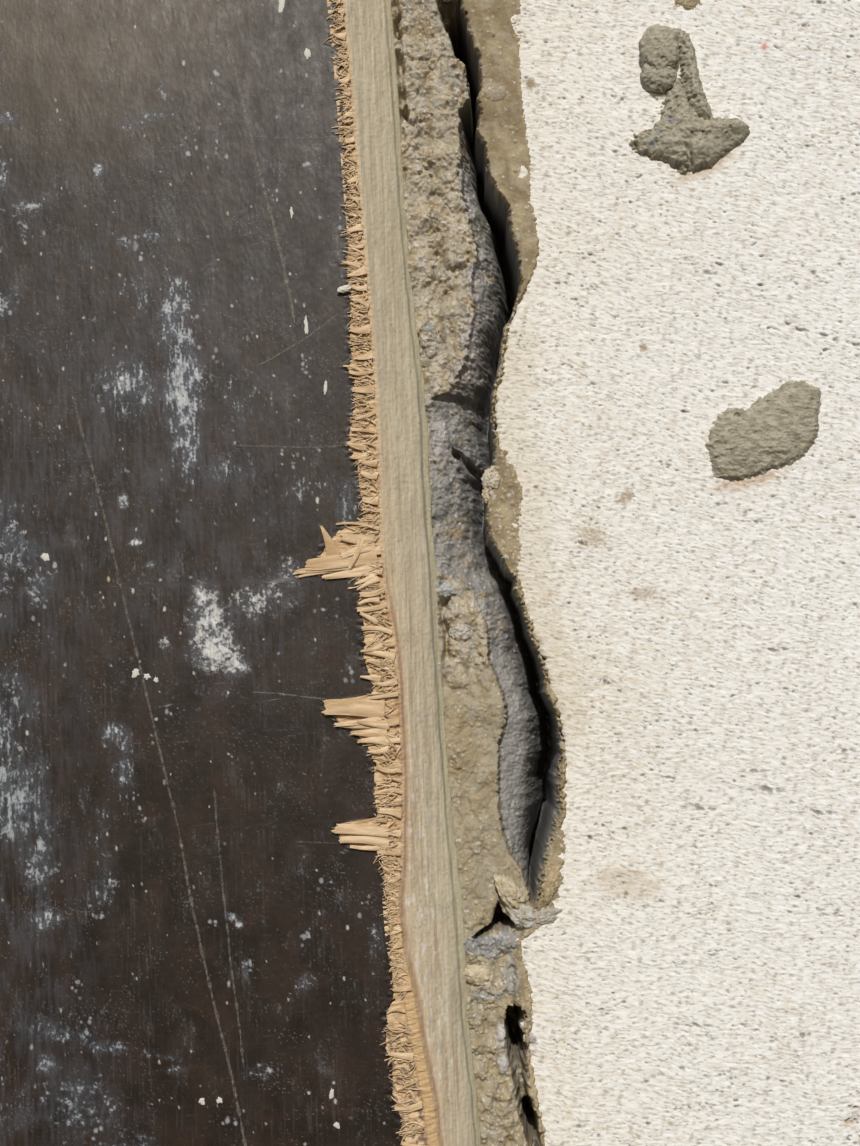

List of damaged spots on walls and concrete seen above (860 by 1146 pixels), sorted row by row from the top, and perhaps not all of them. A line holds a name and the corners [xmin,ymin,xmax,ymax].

water stain [98,362,152,413]
water stain [158,276,206,484]
crack [425,0,566,929]
water stain [0,506,51,607]
water stain [188,557,299,673]
water stain [0,665,59,883]
water stain [102,723,133,798]
water stain [30,909,60,929]
water stain [41,1083,116,1125]
water stain [38,1023,127,1055]
crack [502,1003,544,1146]
spalling [830,1095,860,1146]